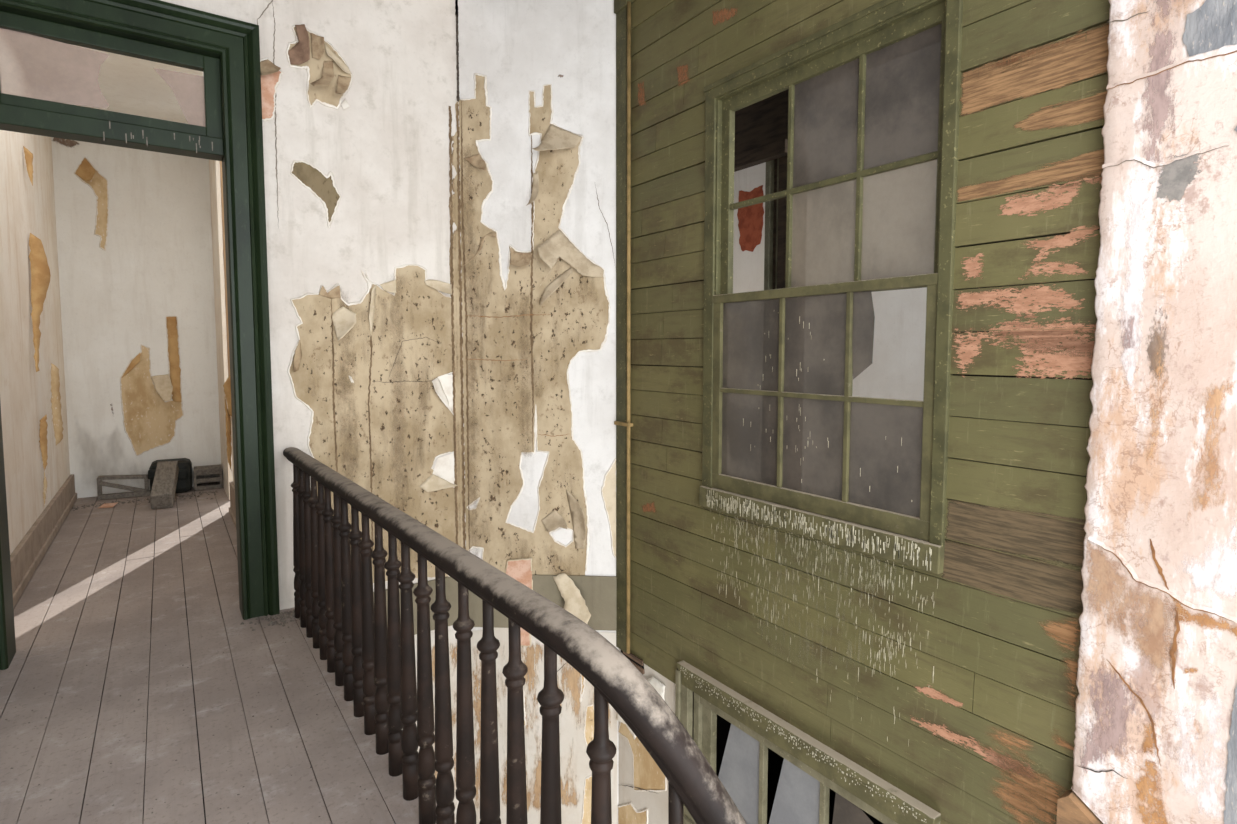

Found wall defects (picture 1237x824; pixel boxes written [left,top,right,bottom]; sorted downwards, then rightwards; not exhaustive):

flaking render [260,24,352,121]
peeling [959,23,1109,131]
crack [1106,47,1237,89]
flaking render [1183,0,1237,57]
peeling [957,148,1104,217]
flaking render [287,73,611,590]
peeling [952,225,1100,379]
peeling [110,316,184,456]
leakage [706,490,938,679]
crack [1088,536,1237,689]
crack [1107,660,1161,766]
peeling [911,716,1063,824]